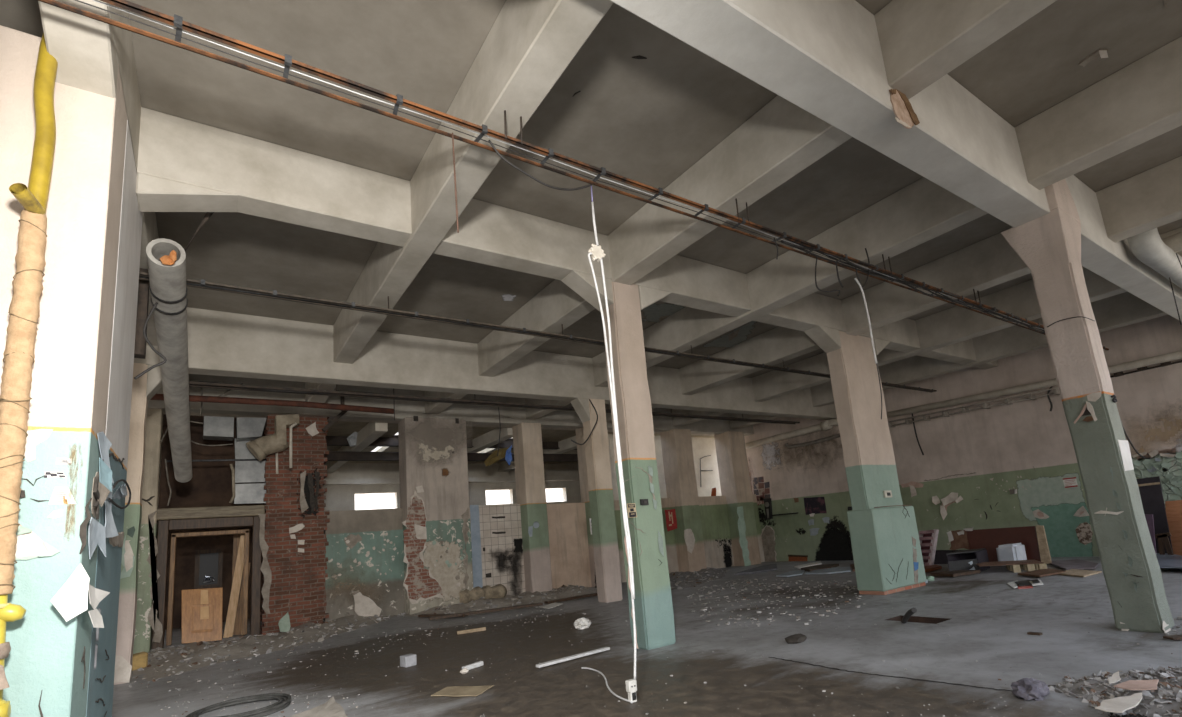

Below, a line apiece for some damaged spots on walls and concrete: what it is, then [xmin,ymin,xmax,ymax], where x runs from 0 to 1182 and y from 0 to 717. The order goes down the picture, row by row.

spalling [889,89,920,129]
peeling [24,429,53,462]
peeling [1132,448,1182,508]
peeling [932,492,963,520]
peeling [15,523,60,560]
spalling [337,491,469,604]